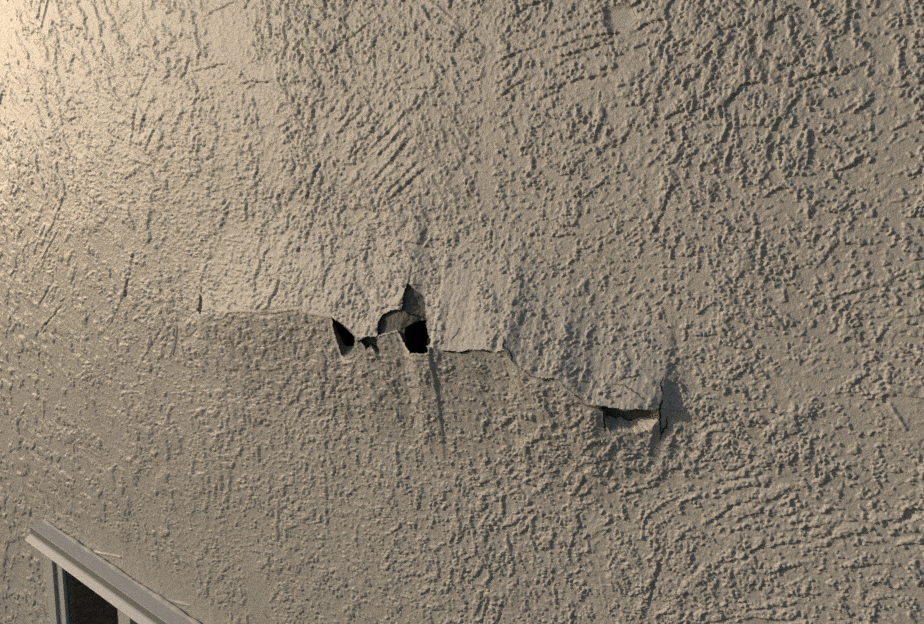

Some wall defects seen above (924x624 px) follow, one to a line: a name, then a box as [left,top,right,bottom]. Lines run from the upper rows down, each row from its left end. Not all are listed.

spalling [330,283,431,359]
spalling [599,407,659,435]
crack [617,378,668,442]